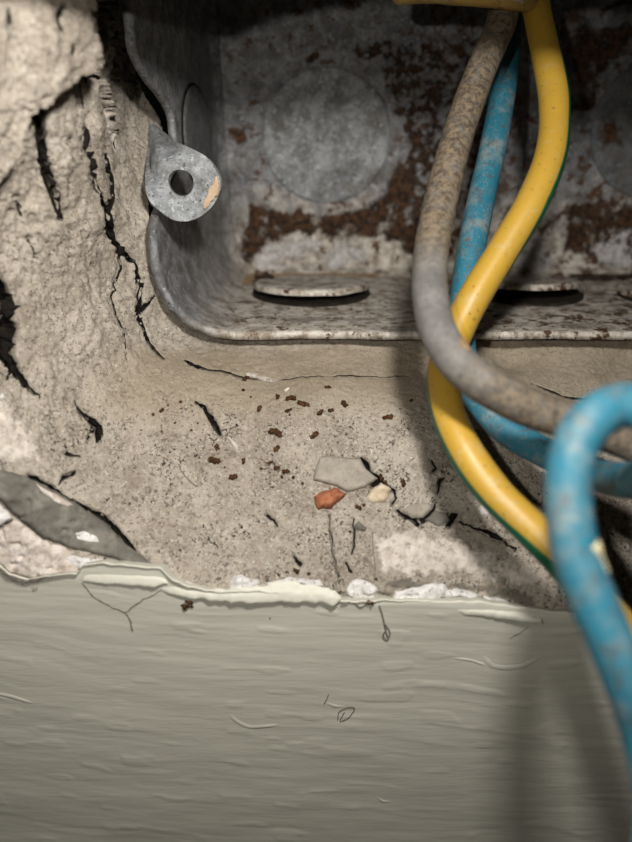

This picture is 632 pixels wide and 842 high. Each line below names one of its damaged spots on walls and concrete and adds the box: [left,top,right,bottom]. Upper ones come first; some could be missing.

crack [28,110,64,219]
corrosion [228,127,248,144]
corrosion [241,38,482,263]
crack [73,74,165,359]
corrosion [254,271,274,282]
corrosion [564,196,632,281]
crack [0,281,40,398]
crack [185,360,408,381]
peeling [366,483,391,503]
peeling [401,503,432,518]
flaking render [0,505,378,606]
flaking render [393,582,543,624]